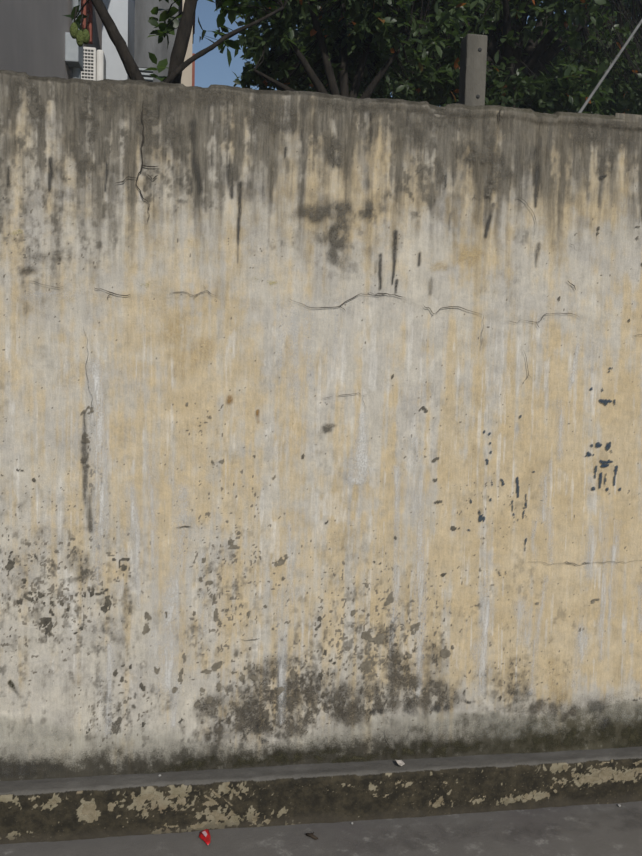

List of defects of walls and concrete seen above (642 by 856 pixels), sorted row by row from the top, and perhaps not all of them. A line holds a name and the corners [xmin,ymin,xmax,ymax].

damp [228,165,242,243]
damp [301,202,384,263]
damp [379,230,398,292]
crack [290,292,405,310]
crack [424,306,484,349]
damp [81,360,106,534]
damp [196,573,470,745]
damp [107,646,122,734]
damp [517,705,642,754]
spalling [130,792,187,815]
spalling [190,785,247,829]
spalling [504,760,642,800]